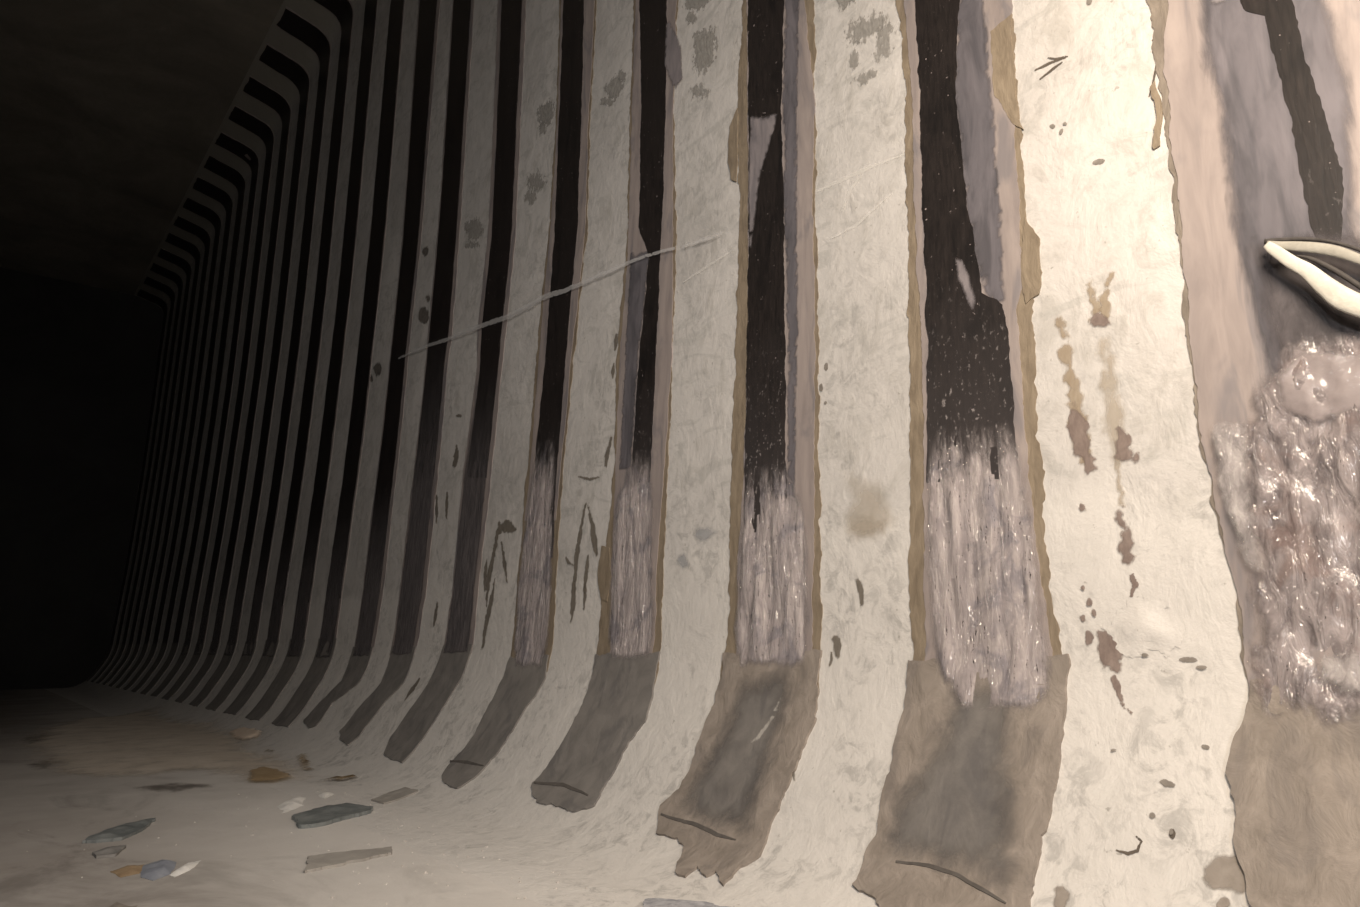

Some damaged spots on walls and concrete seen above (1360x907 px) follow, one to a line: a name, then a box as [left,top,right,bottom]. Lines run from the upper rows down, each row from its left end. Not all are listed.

spalling [682,0,718,99]
spalling [600,70,626,106]
corrosion [1087,272,1114,327]
corrosion [1056,318,1097,474]
corrosion [1101,345,1140,597]
water stain [856,579,864,606]
water stain [829,636,841,666]
corrosion [1080,585,1133,713]
spalling [1179,657,1207,670]